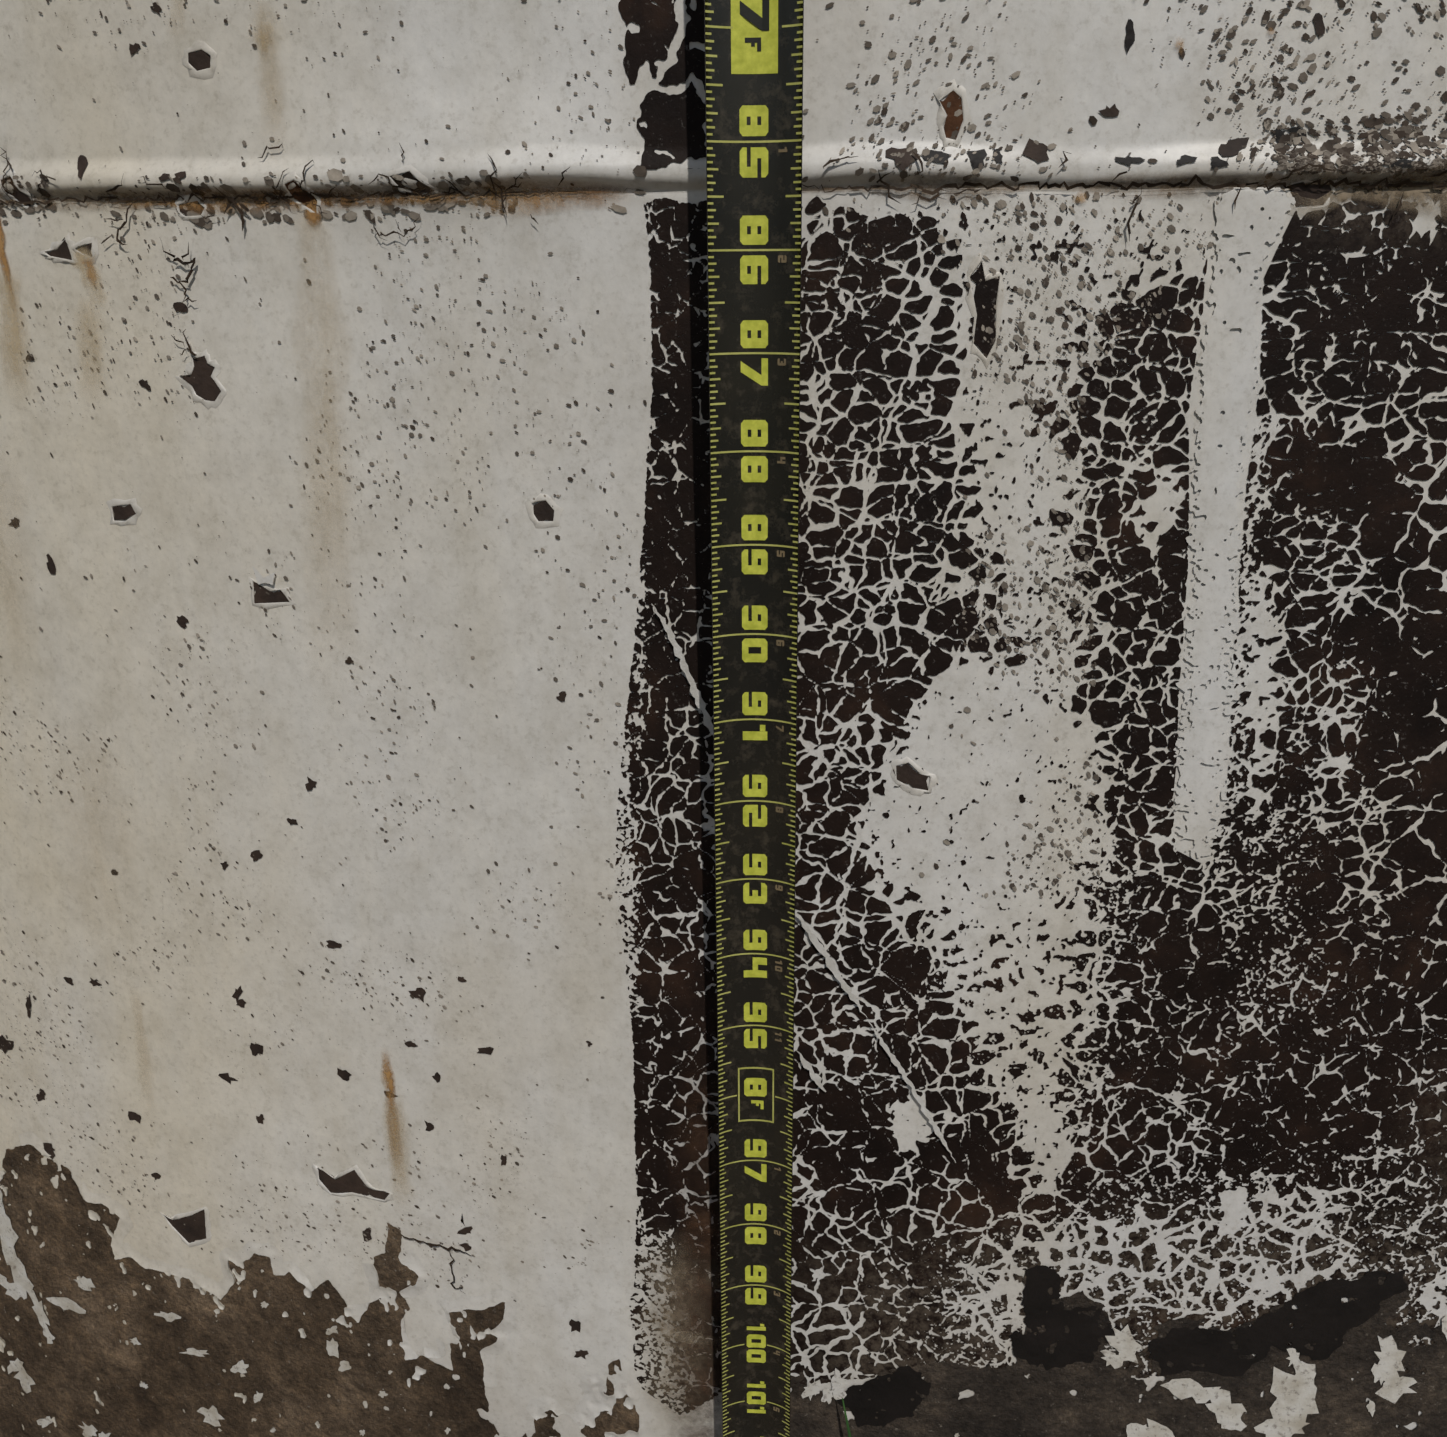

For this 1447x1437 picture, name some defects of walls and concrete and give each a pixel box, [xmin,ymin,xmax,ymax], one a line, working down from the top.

corrosion [4,192,357,224]
peeling [40,232,99,265]
corrosion [0,221,20,364]
peeling [175,341,227,409]
peeling [522,198,722,1437]
peeling [790,174,1447,1437]
peeling [232,986,246,1007]
peeling [409,988,426,1002]
peeling [0,1035,13,1053]
peeling [250,1043,263,1056]
corrosion [383,1060,401,1156]
peeling [0,1131,517,1437]